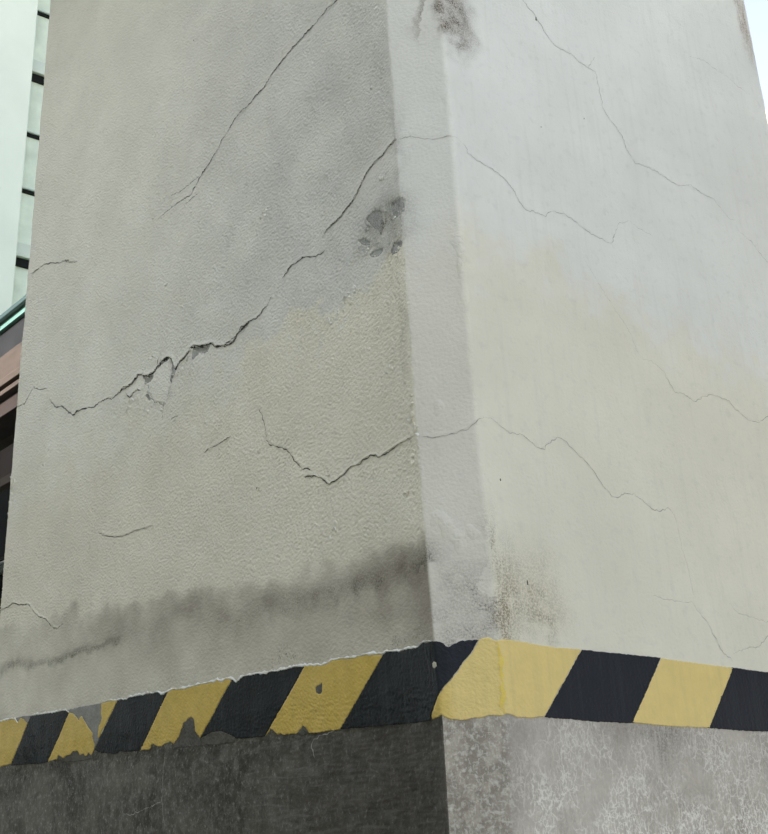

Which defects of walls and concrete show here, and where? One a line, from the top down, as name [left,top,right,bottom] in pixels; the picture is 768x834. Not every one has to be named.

leakage [434,0,466,45]
crack [159,0,337,218]
crack [283,136,649,277]
crack [18,297,271,430]
spalling [143,360,175,403]
crack [259,410,768,657]
crack [1,602,60,628]
peeling [0,640,432,762]